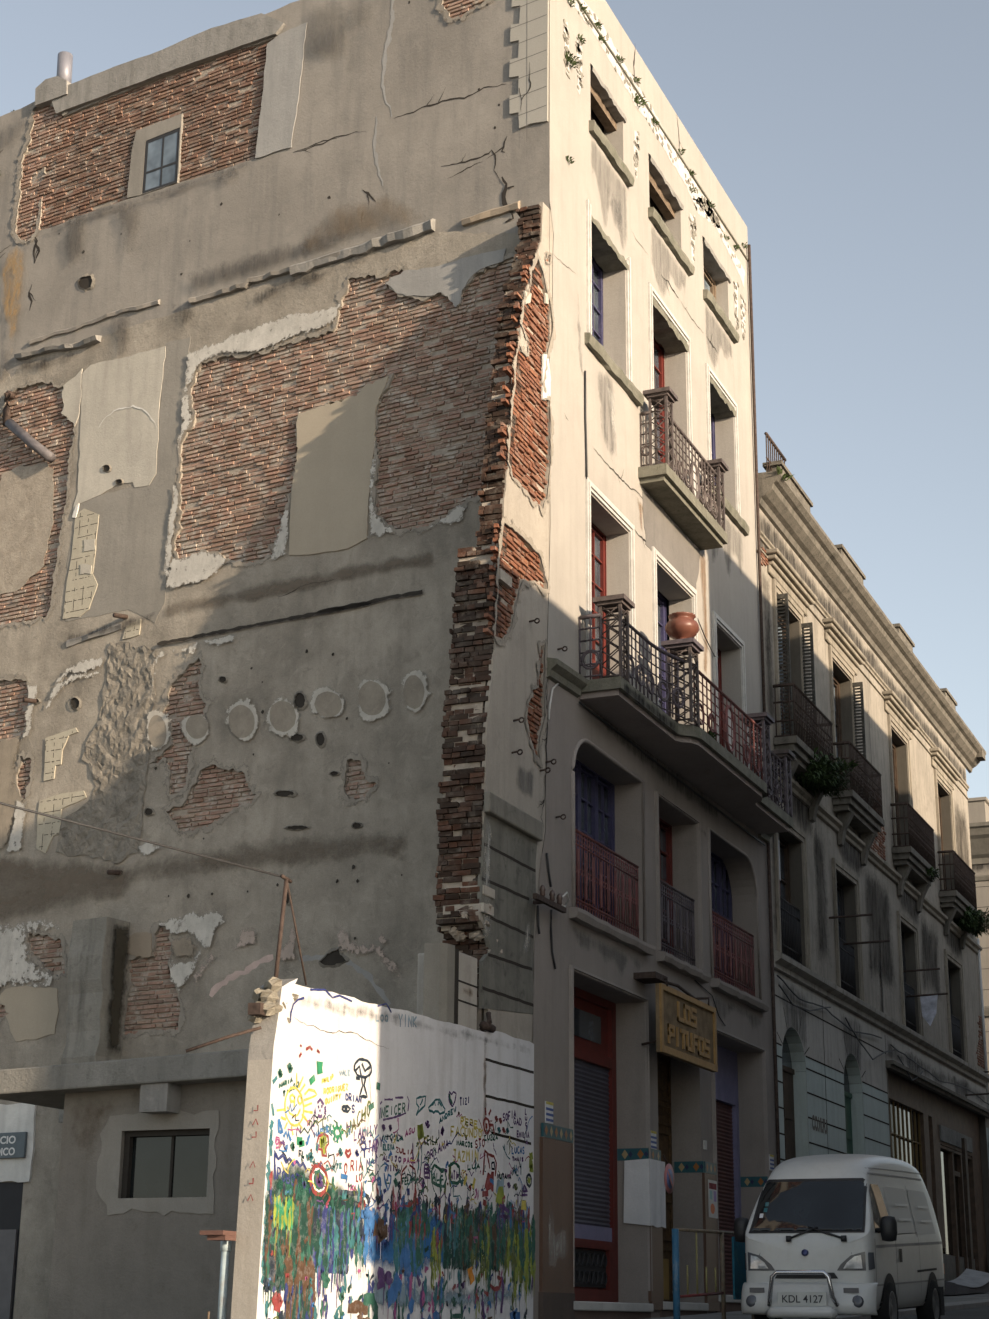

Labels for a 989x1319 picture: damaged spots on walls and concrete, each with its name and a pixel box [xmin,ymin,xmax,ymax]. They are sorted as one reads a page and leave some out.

flaking render [435,0,493,23]
crack [395,62,531,118]
flaking render [10,102,70,245]
crack [441,137,514,223]
flaking render [563,0,747,340]
flaking render [164,248,556,588]
flaking render [0,377,77,630]
flaking render [483,516,550,647]
flaking render [0,635,298,864]
peeling [0,919,68,987]
flaking render [123,894,299,1053]